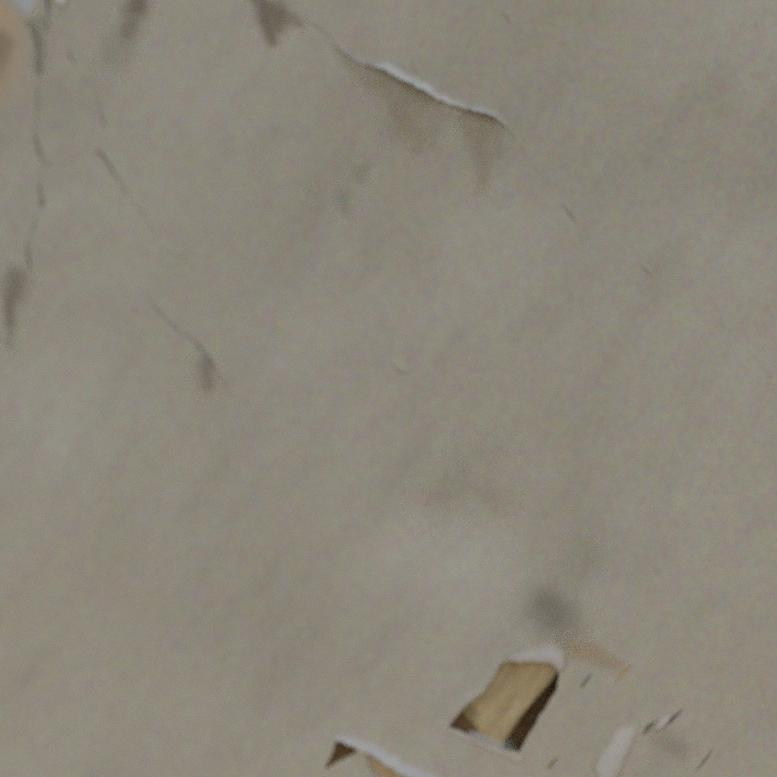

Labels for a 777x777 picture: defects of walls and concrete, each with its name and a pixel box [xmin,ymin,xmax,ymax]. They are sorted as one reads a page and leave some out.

peeling [0,0,67,110]
crack [26,26,53,271]
peeling [324,729,448,777]
spalling [444,642,566,763]
peeling [593,720,640,777]